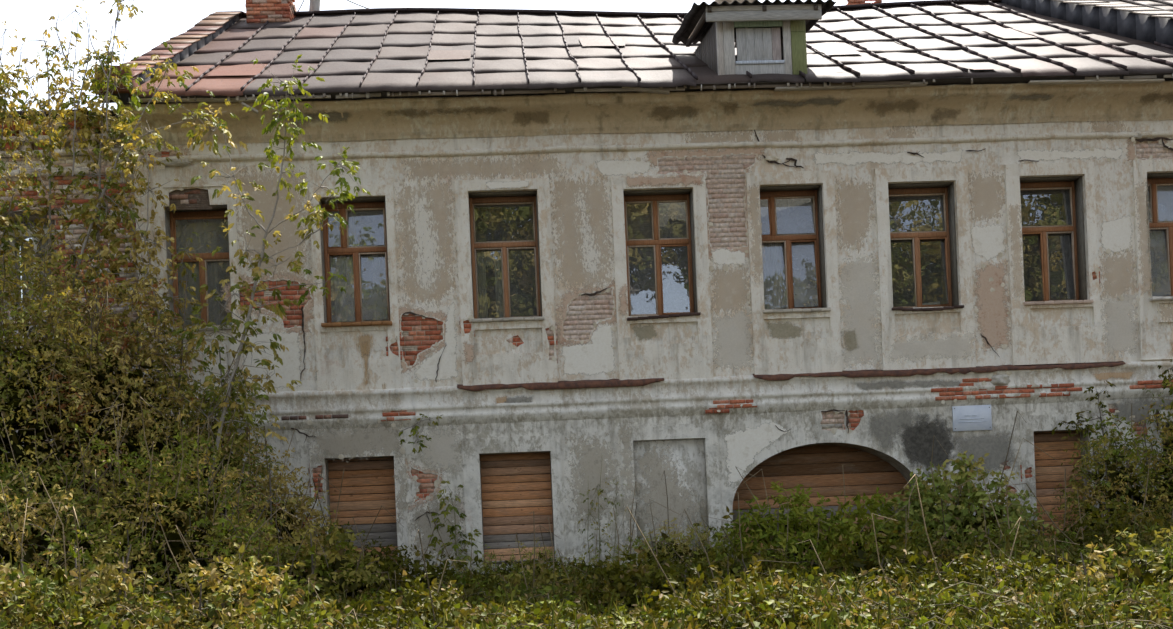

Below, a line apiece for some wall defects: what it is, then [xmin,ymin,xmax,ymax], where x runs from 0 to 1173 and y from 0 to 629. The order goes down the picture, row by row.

peeling [1017,121,1173,164]
peeling [221,166,314,389]
spalling [385,129,801,383]
peeling [813,147,1025,369]
peeling [1087,182,1154,301]
peeling [281,410,465,562]
spalling [705,397,757,414]
peeling [724,422,793,487]
spalling [820,409,864,434]
leakage [871,411,1013,477]
spalling [931,374,1082,404]